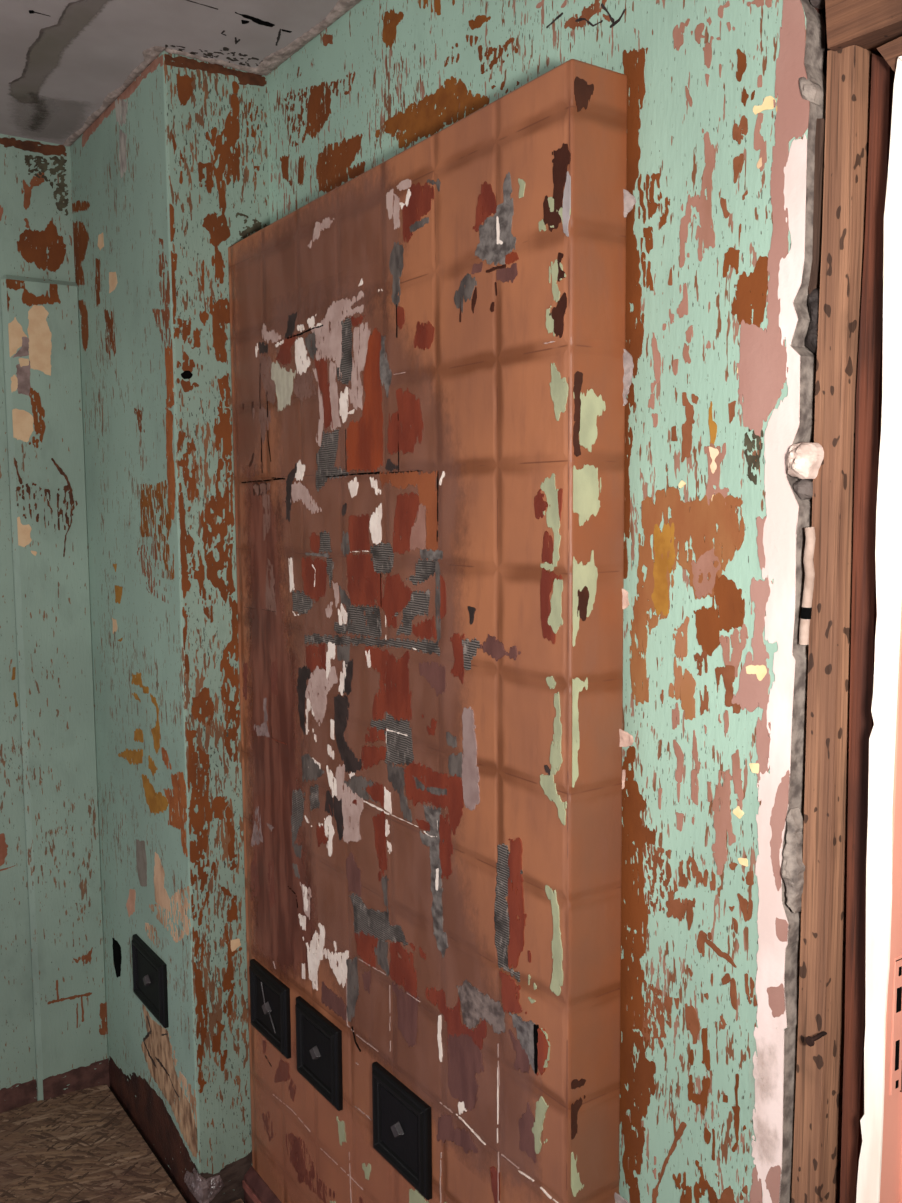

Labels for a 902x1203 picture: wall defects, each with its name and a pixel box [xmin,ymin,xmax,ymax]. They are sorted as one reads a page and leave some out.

crack [9,0,84,84]
crack [187,0,292,46]
peeling [561,0,612,30]
flaking render [0,0,519,1203]
flaking render [614,0,810,1203]